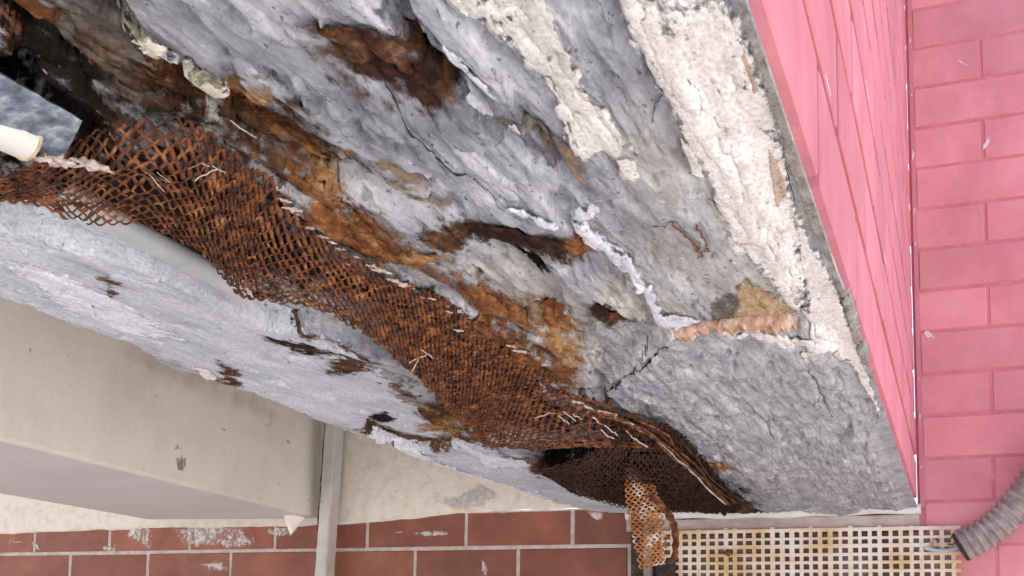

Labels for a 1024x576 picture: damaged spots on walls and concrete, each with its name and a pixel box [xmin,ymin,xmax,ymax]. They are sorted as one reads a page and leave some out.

spalling [0,0,230,189]
peeling [0,186,645,513]
rust [67,15,703,514]
crack [384,79,523,221]
peeling [374,0,888,434]
crack [600,336,668,404]
damp [128,528,150,548]
rust [708,461,769,516]